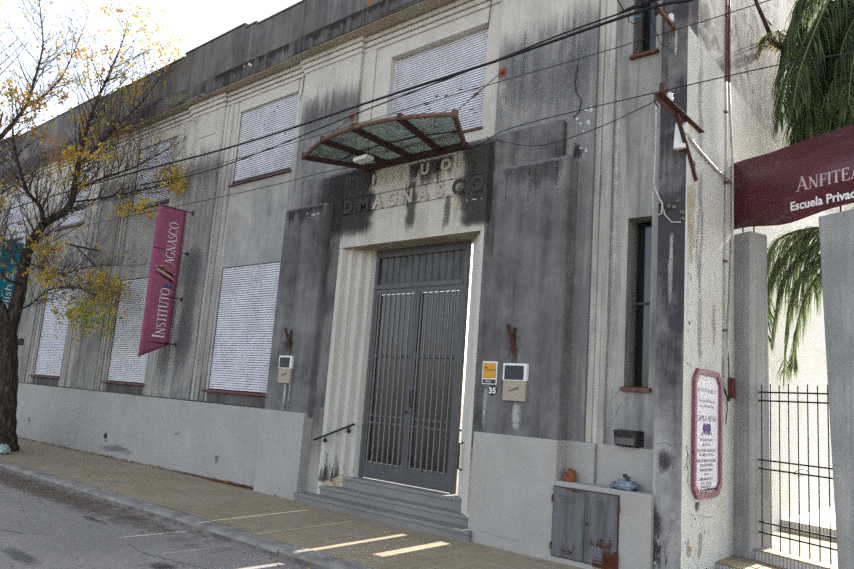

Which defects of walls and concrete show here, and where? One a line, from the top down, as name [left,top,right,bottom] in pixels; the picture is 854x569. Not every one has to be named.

damp [306,0,392,40]
damp [215,43,289,81]
damp [319,468,339,482]
corrosion [590,541,618,569]